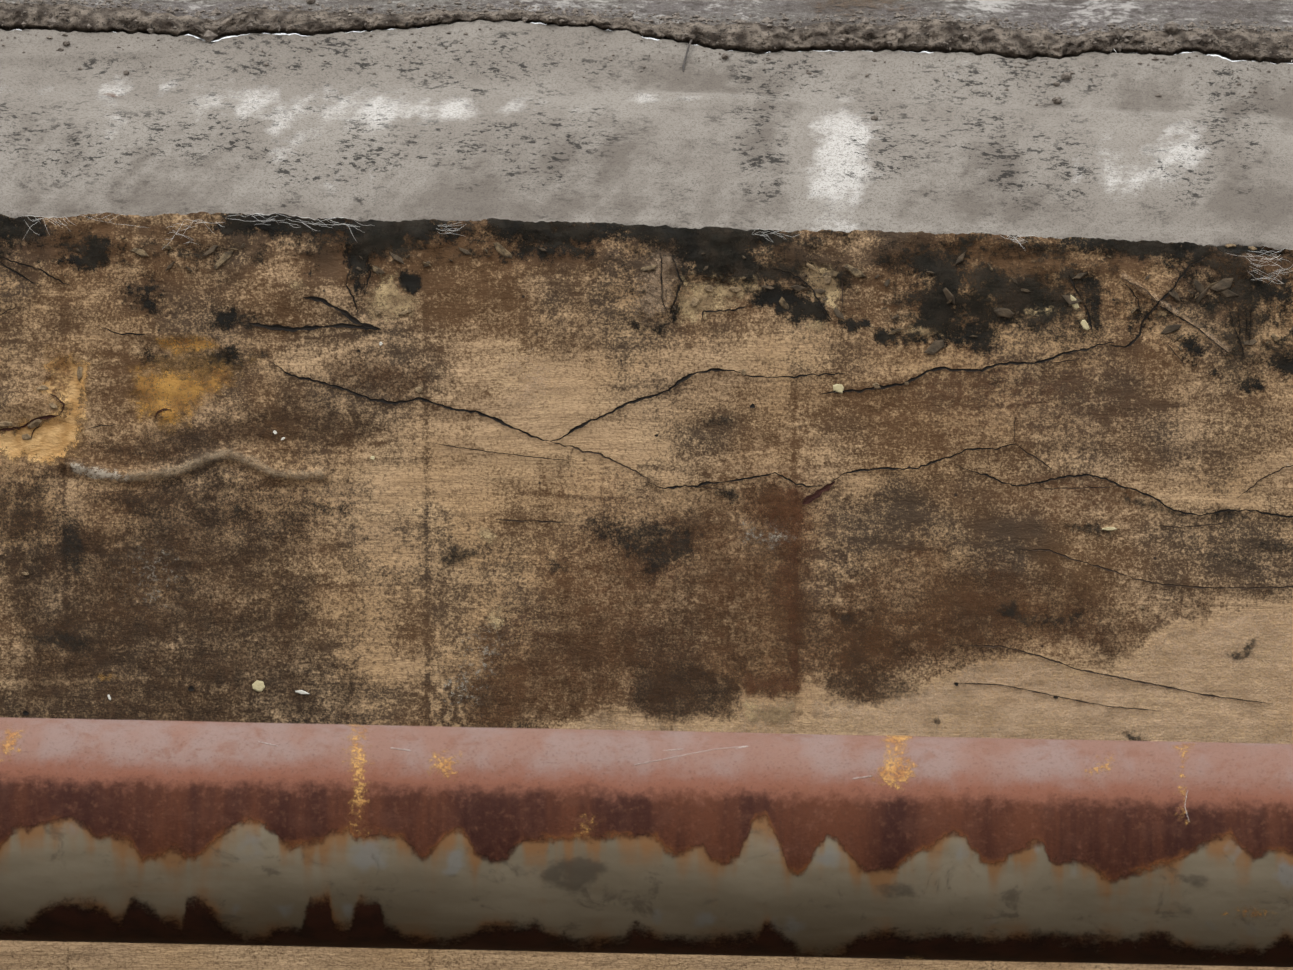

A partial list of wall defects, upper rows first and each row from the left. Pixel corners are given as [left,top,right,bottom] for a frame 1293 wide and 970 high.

crack [0,257,70,316]
crack [99,325,146,335]
damp [0,213,1293,394]
crack [273,243,1293,528]
damp [0,395,374,725]
crack [1012,549,1293,589]
damp [423,481,1132,730]
crack [954,644,1271,712]
damp [1231,639,1255,660]
corrosion [0,717,1293,883]
corrosion [0,895,1293,967]